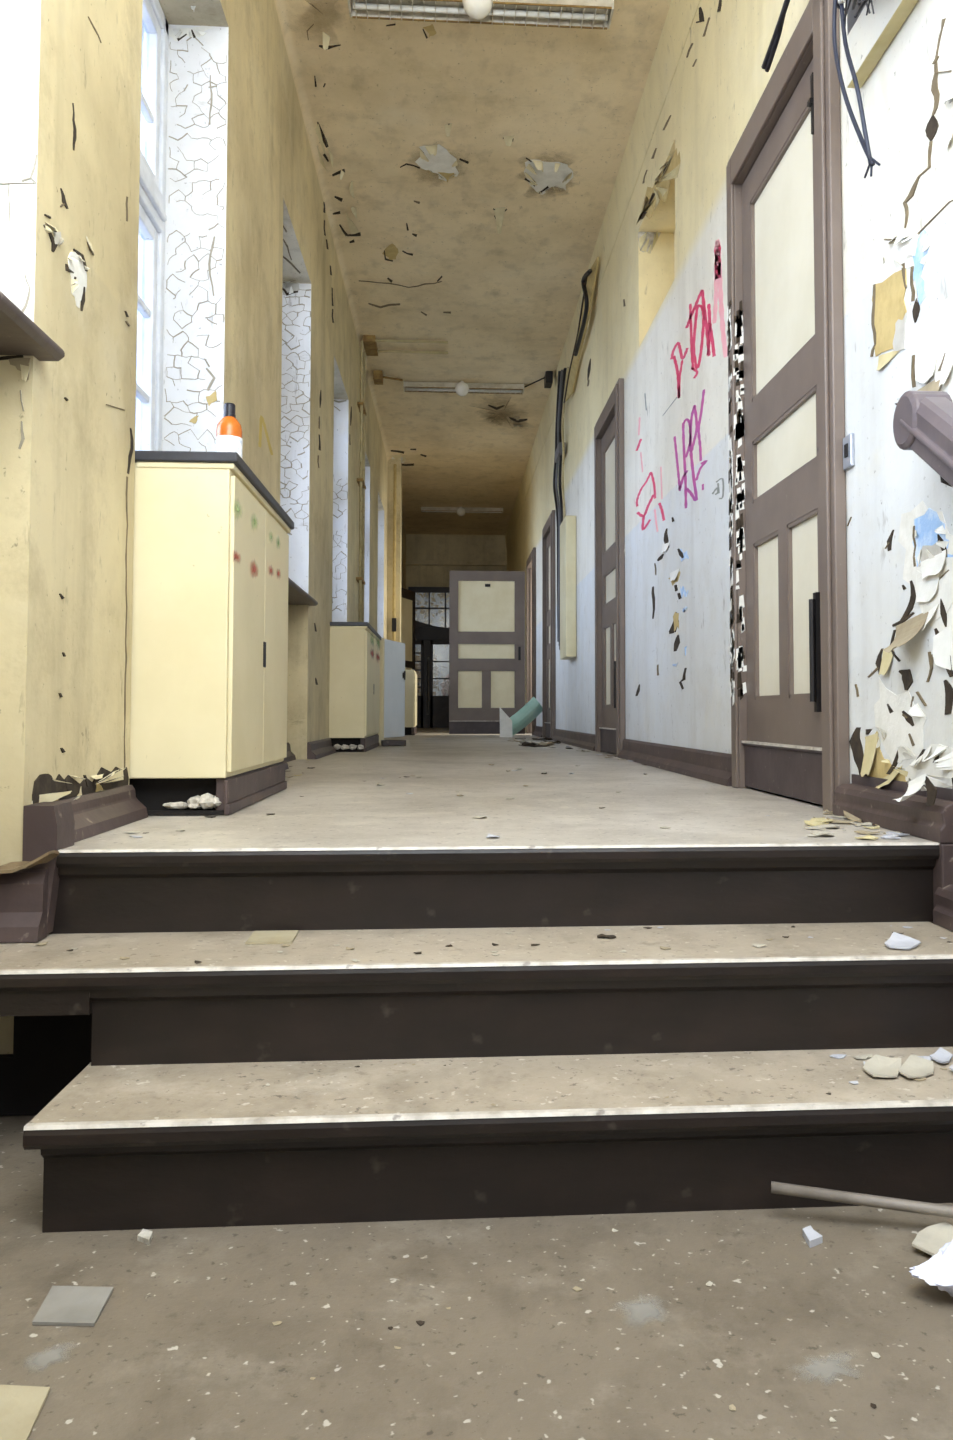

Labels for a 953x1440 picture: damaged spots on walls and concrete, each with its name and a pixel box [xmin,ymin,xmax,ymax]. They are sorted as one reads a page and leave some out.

peeling [686,0,722,58]
crack [0,154,69,223]
crack [70,103,78,151]
peeling [400,144,469,182]
spalling [636,148,681,253]
crack [903,18,953,234]
peeling [43,214,94,311]
crack [359,276,451,316]
peeling [870,230,953,401]
peeling [657,517,689,689]
peeling [849,500,953,806]
spalling [32,767,129,804]